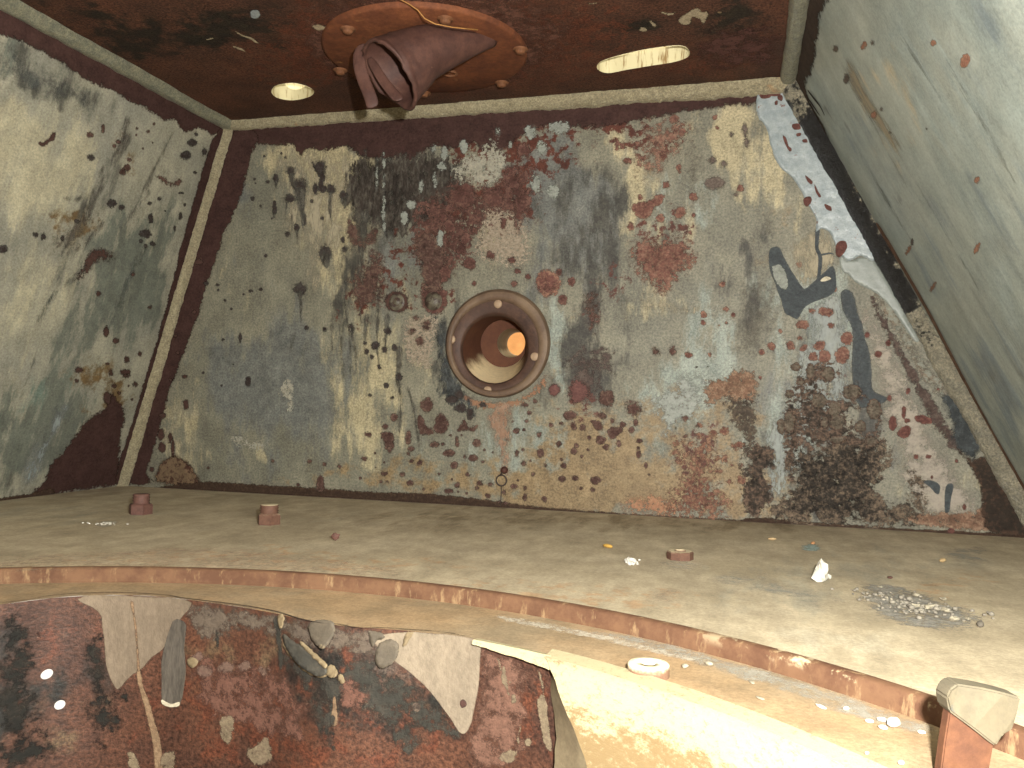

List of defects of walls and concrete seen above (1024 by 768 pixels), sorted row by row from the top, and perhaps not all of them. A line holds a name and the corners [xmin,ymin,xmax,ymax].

rust [0,0,762,505]
rust [621,293,1024,537]
peeling [756,93,978,515]
rust [189,655,307,741]
rust [339,678,370,712]
rust [460,650,527,767]